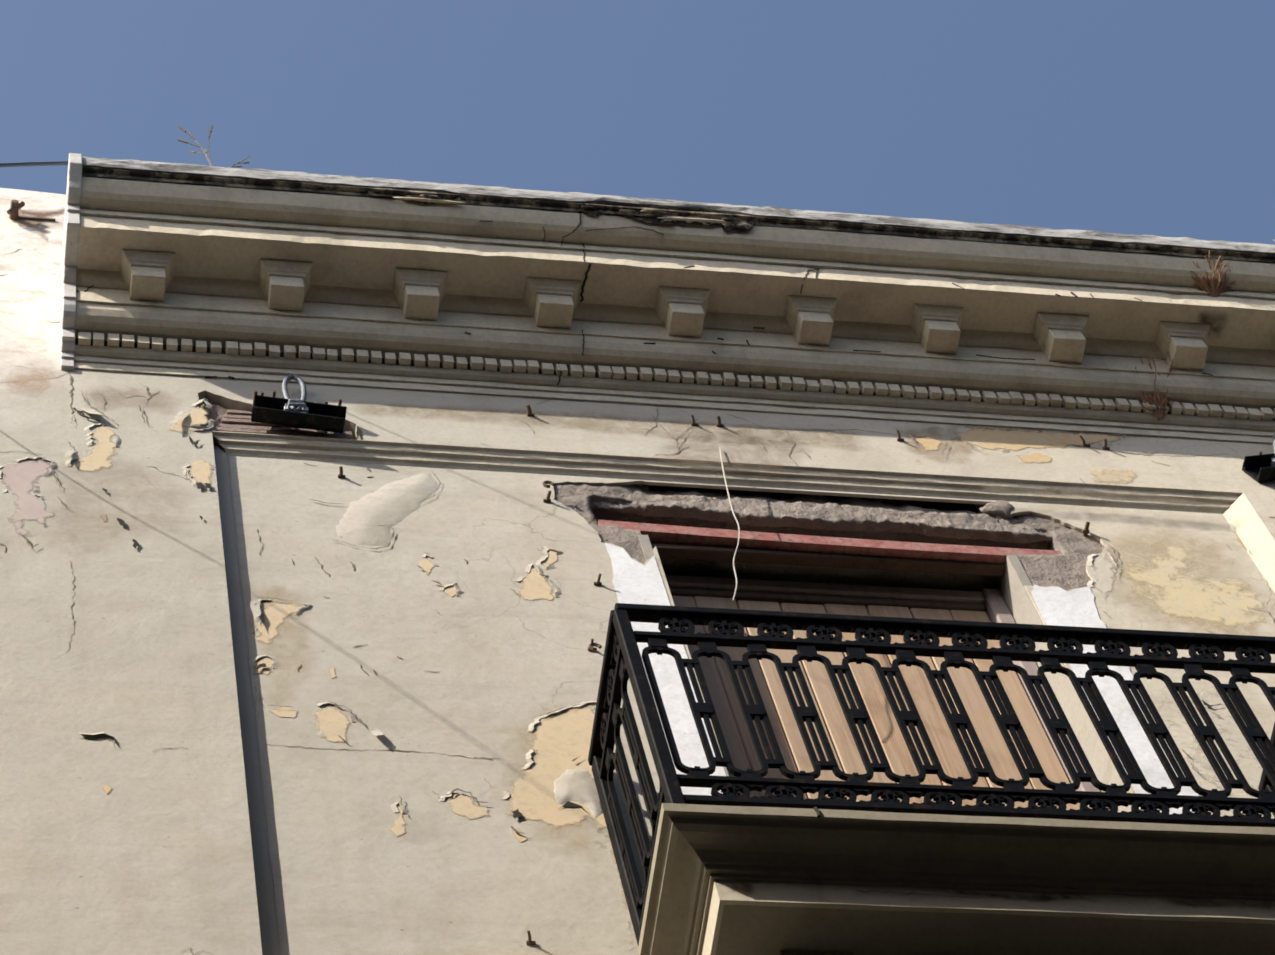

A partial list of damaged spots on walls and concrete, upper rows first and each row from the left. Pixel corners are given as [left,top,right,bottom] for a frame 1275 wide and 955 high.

crack [521,206,664,434]
peeling [0,390,122,548]
peeling [181,460,217,489]
spalling [168,398,354,445]
peeling [896,425,1128,463]
peeling [1080,469,1136,483]
spalling [100,514,139,549]
peeling [511,546,563,600]
spalling [553,483,1272,628]
peeling [249,597,313,718]
peeling [314,702,383,743]
peeling [432,701,616,863]